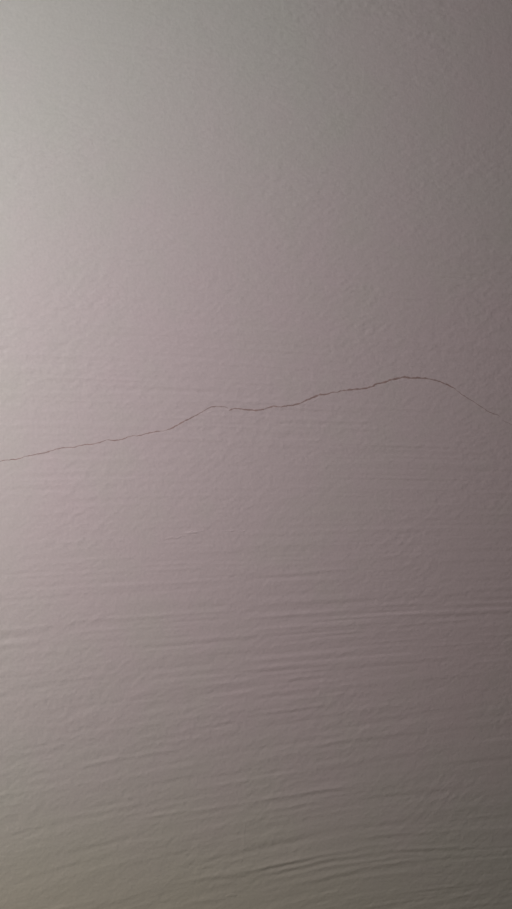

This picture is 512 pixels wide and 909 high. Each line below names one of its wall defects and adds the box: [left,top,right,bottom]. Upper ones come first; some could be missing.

crack [0,376,512,462]